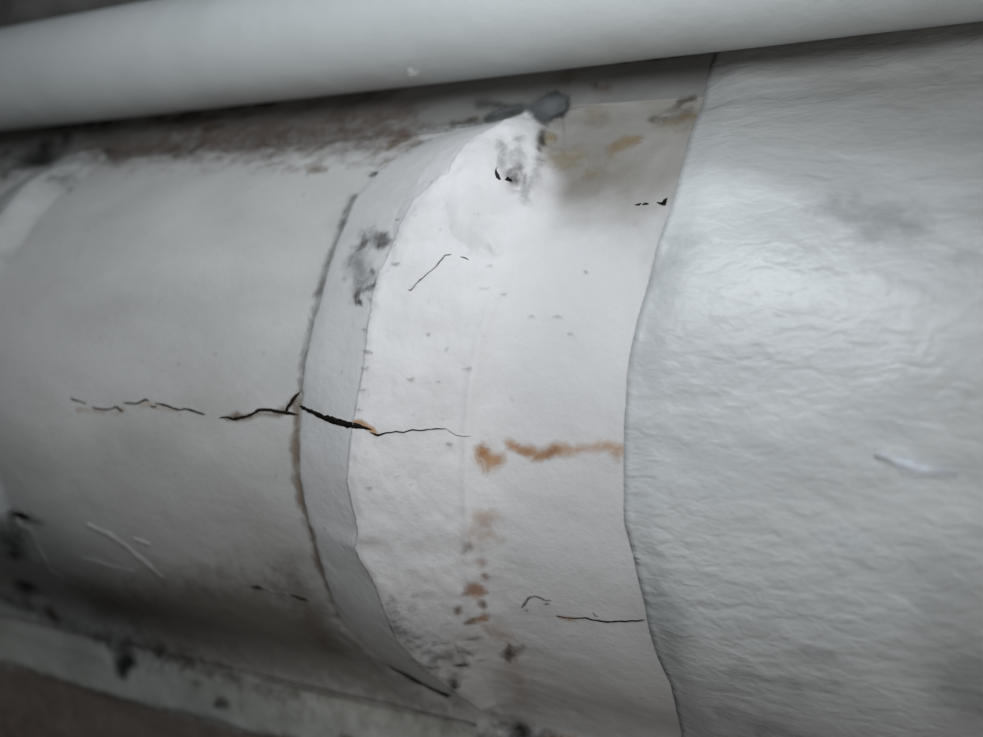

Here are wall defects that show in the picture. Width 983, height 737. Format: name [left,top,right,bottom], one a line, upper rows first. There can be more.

crack [70,392,465,437]
corrosion [481,450,501,465]
crack [12,511,30,519]
corrosion [466,585,486,623]
crack [521,595,645,623]
water stain [0,665,285,737]